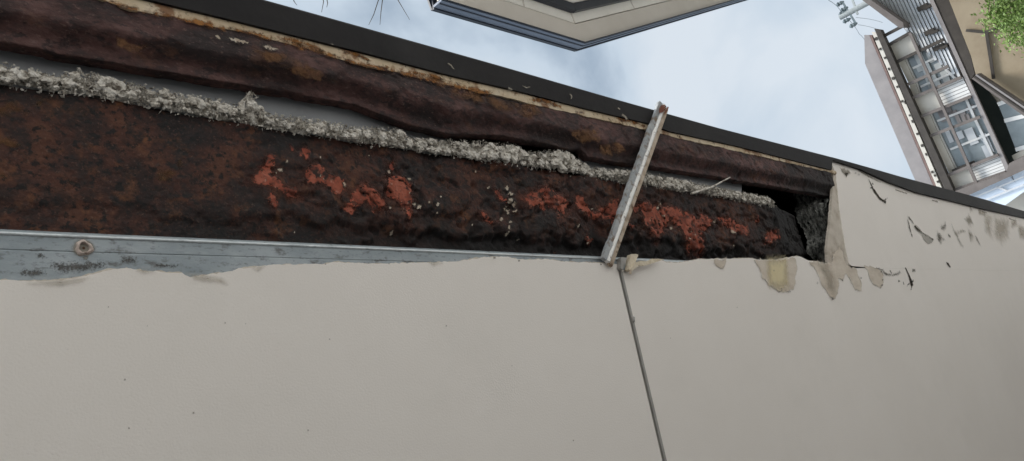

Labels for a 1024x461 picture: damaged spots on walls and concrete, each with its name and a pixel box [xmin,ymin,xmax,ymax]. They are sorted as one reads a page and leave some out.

corrosion [105,0,561,118]
corrosion [21,240,136,276]
peeling [754,247,884,300]